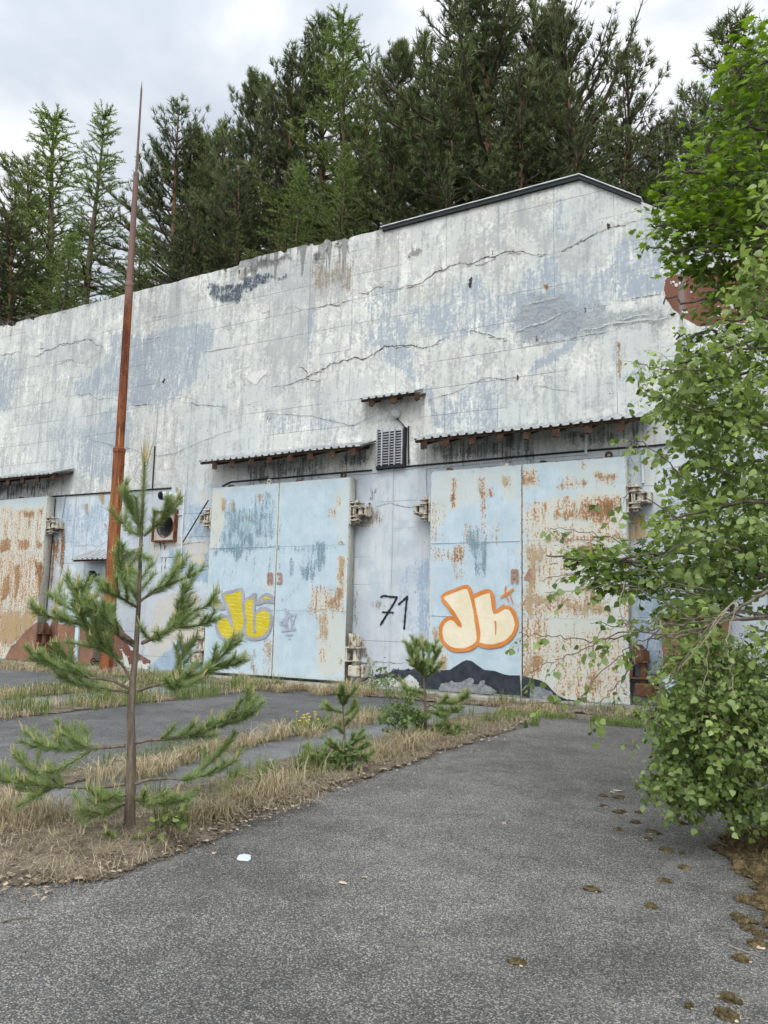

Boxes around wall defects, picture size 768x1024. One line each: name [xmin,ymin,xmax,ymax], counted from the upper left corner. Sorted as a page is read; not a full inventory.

peeling [207,267,287,303]
water stain [311,247,351,292]
crack [265,221,636,313]
crack [4,339,101,375]
crack [274,328,606,387]
rust [554,500,615,522]
rust [0,565,37,646]
rust [0,529,65,597]
rust [316,542,357,639]
rust [521,541,610,619]